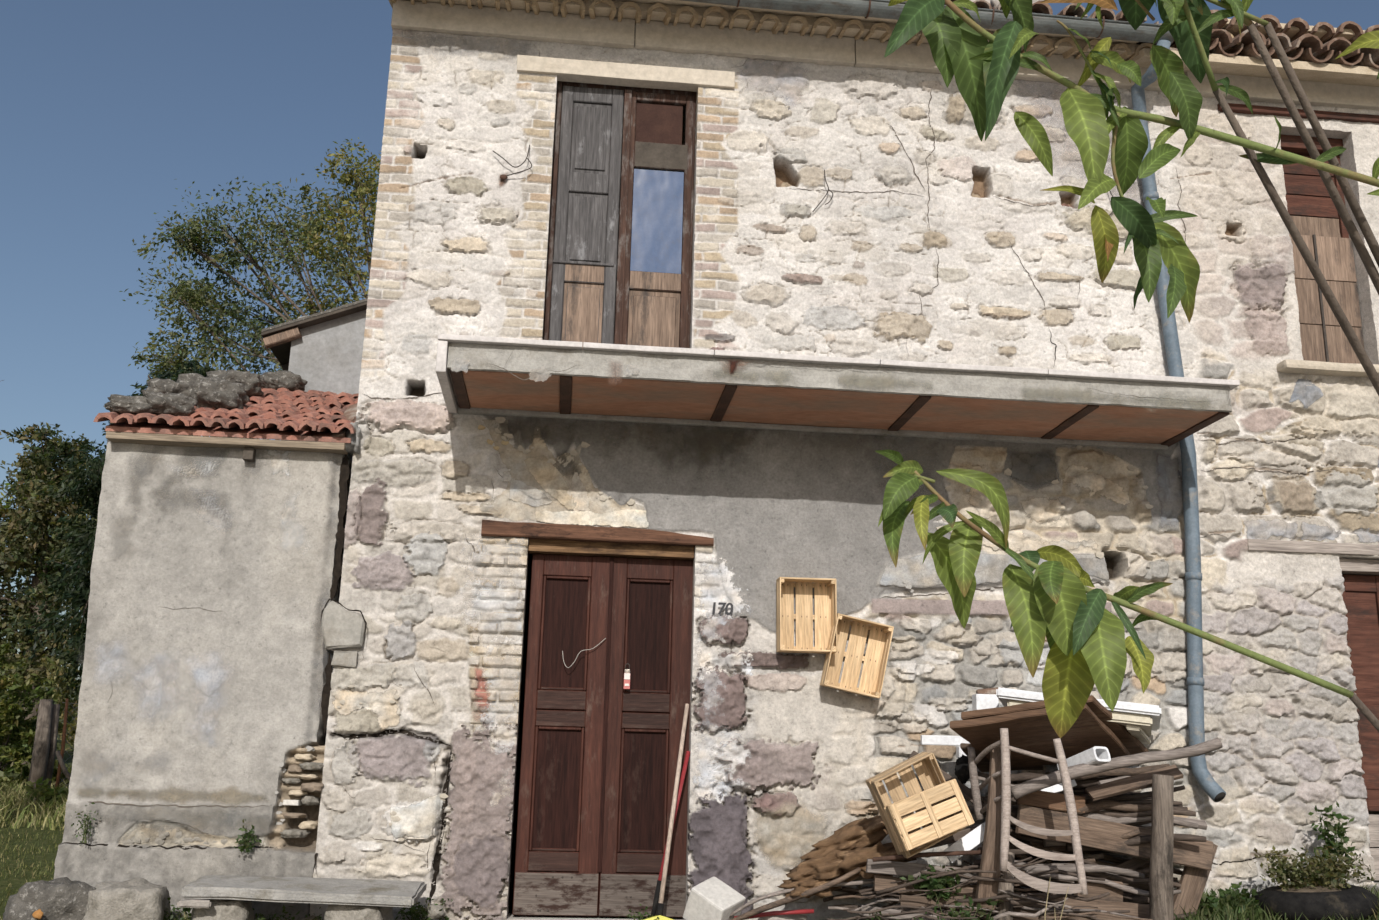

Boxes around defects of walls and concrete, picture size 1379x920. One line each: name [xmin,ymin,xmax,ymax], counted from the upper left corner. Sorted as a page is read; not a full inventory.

crack [716,89,939,371]
crack [1009,241,1080,365]
flaking render [478,417,649,528]
flaking render [936,445,1153,591]
flaking render [880,553,943,593]
peeling [459,580,523,657]
peeling [331,650,358,668]
flaking render [332,685,400,730]
peeling [489,715,516,754]
flaking render [389,793,448,843]